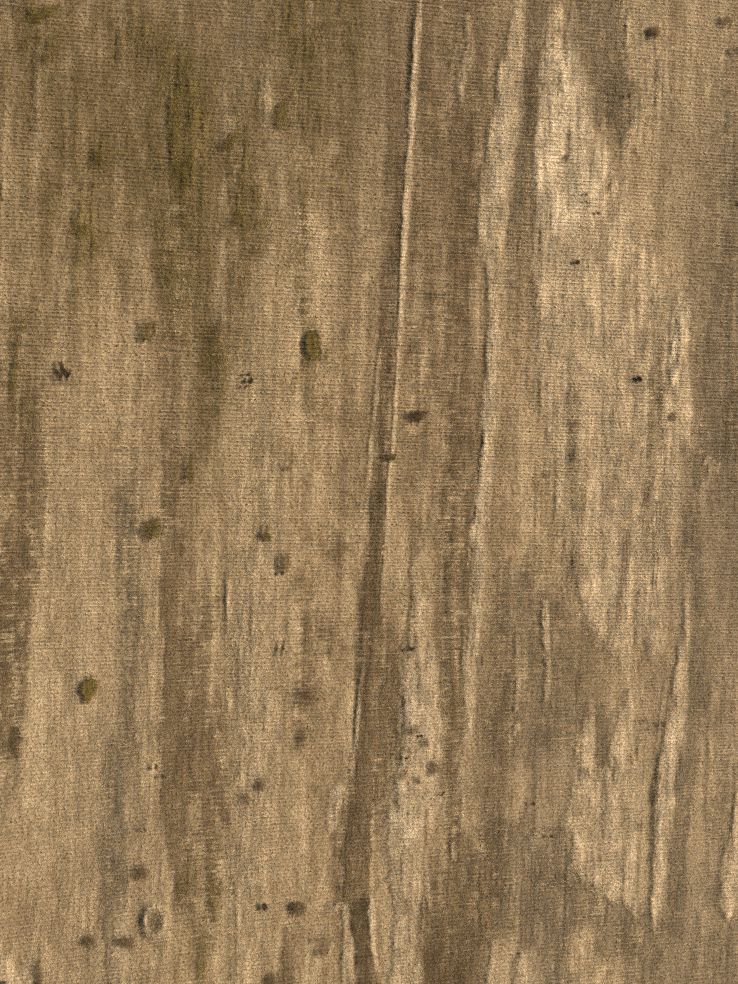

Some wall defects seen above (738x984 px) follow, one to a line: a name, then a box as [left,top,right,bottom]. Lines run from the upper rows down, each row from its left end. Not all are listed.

damp [0,300,345,984]
damp [327,0,738,984]